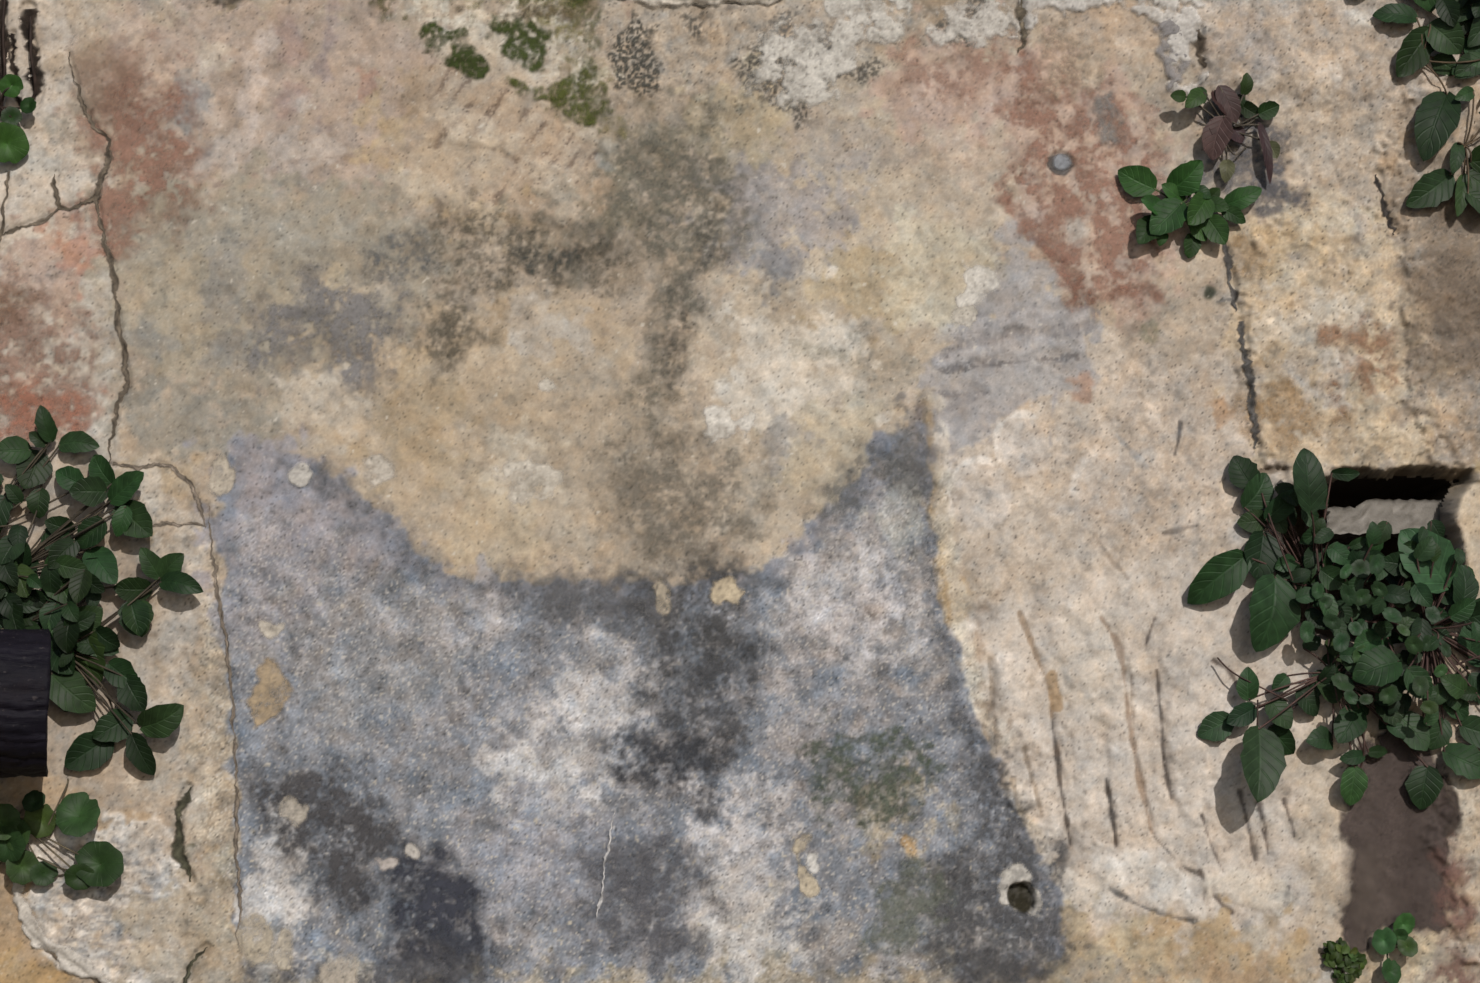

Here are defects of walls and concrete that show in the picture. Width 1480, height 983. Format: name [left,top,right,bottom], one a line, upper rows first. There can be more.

damp [608,132,726,321]
crack [0,0,243,983]
damp [824,451,928,516]
damp [534,451,763,820]
peeling [12,883,111,983]
damp [250,772,496,983]
damp [583,834,701,964]
damp [863,736,1072,983]
damp [1339,729,1462,952]